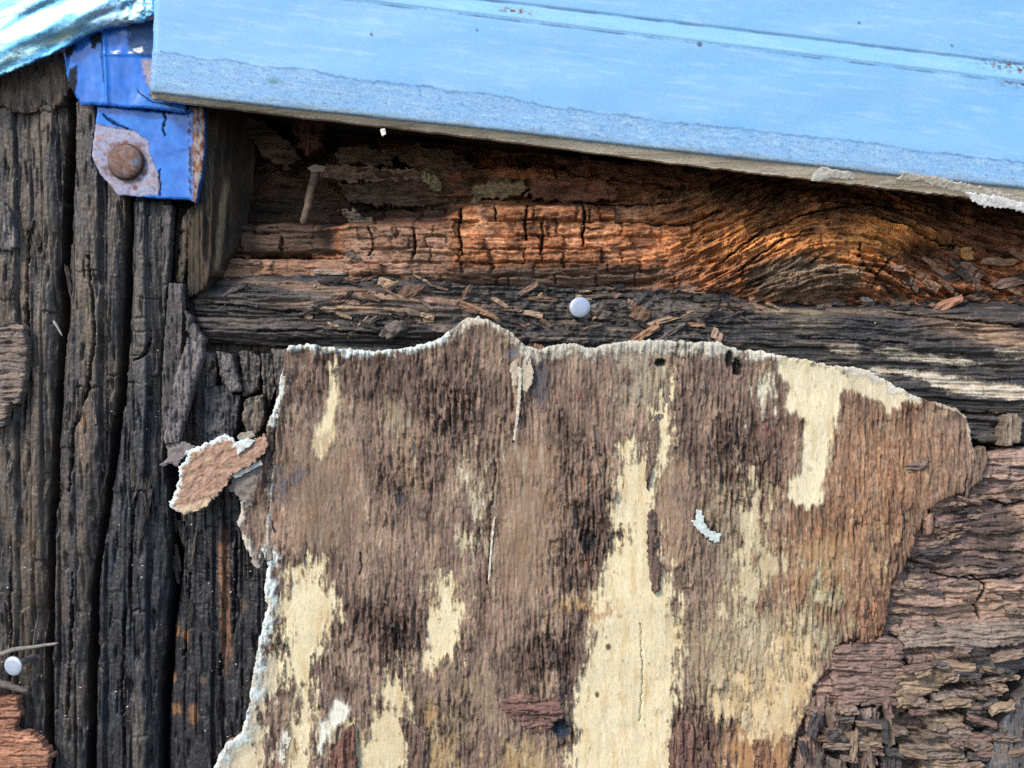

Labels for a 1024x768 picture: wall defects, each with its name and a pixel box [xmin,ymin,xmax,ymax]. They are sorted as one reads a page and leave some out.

crack [456,208,464,255]
crack [524,205,544,255]
crack [66,574,75,717]
crack [70,255,96,490]
crack [122,496,137,746]
peeling [312,354,340,460]
peeling [220,549,496,768]
peeling [390,404,429,497]
peeling [454,424,565,598]
peeling [561,349,1024,768]
peeling [496,718,548,768]